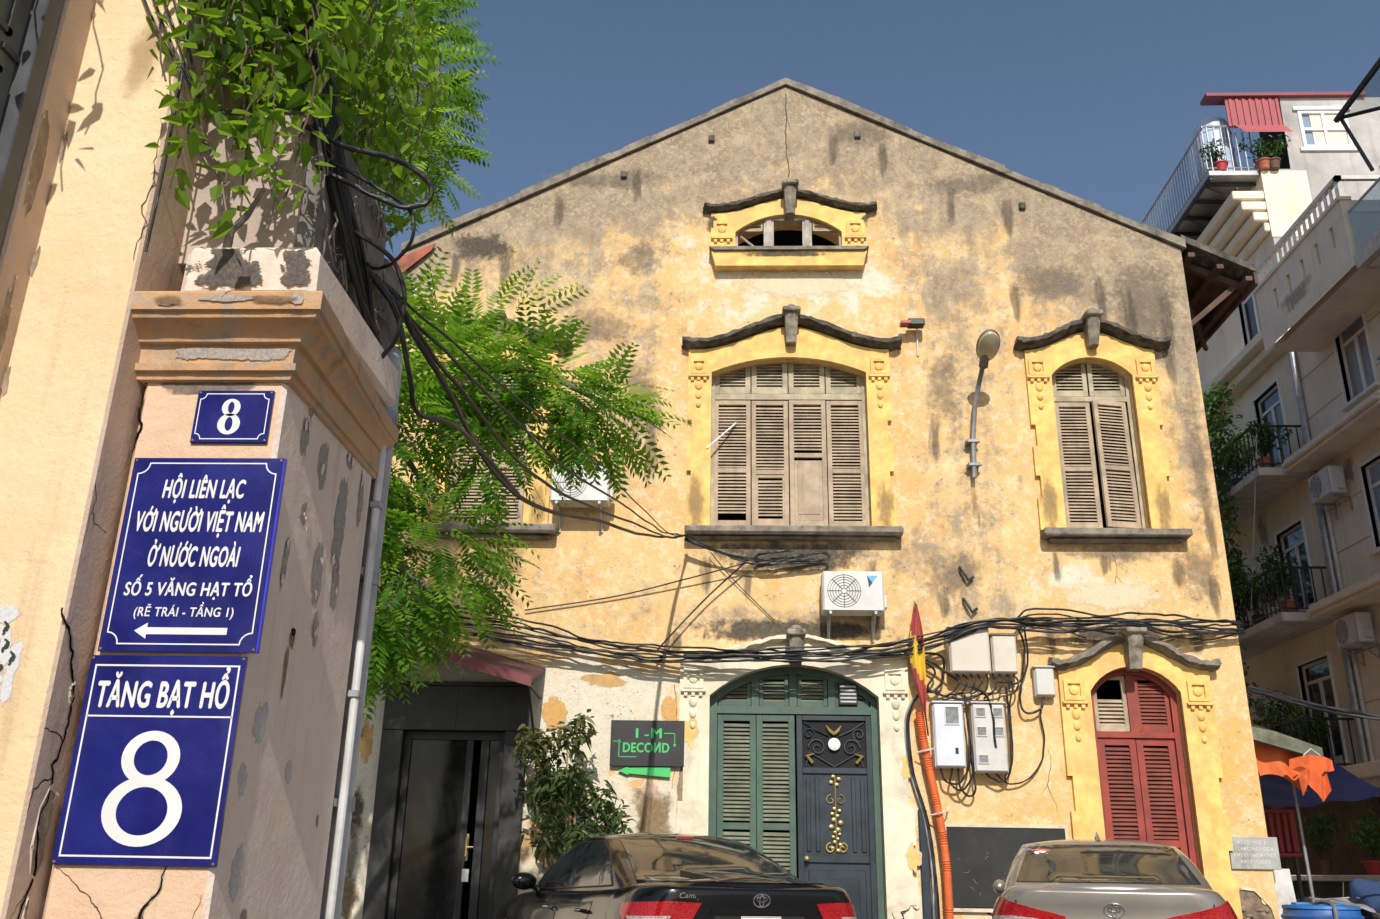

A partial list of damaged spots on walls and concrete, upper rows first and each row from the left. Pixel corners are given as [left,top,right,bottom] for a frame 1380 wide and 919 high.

peeling [184,248,262,302]
peeling [280,249,312,304]
leakage [452,233,508,281]
peeling [300,408,365,647]
peeling [280,538,290,592]
leakage [706,542,858,591]
leakage [704,616,879,641]
peeling [580,671,627,688]
crack [11,608,167,919]
peeling [359,716,374,764]